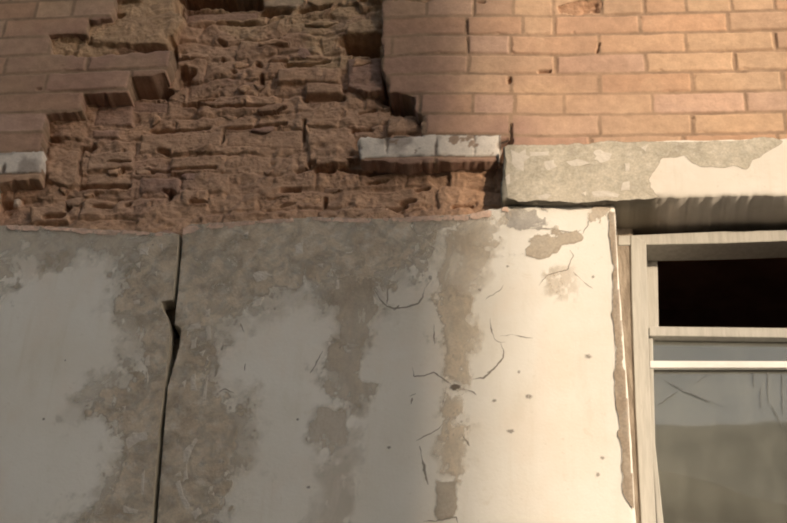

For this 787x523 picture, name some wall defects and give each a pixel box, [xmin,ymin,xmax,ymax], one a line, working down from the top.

spalling [558,0,602,16]
peeling [505,137,783,203]
water stain [6,225,163,236]
spalling [0,0,504,523]
water stain [383,210,492,222]
peeling [526,228,583,259]
water stain [324,276,381,406]
crack [373,283,429,310]
water stain [433,232,487,384]
crack [411,323,528,405]
crack [416,425,442,484]
water stain [435,396,468,520]